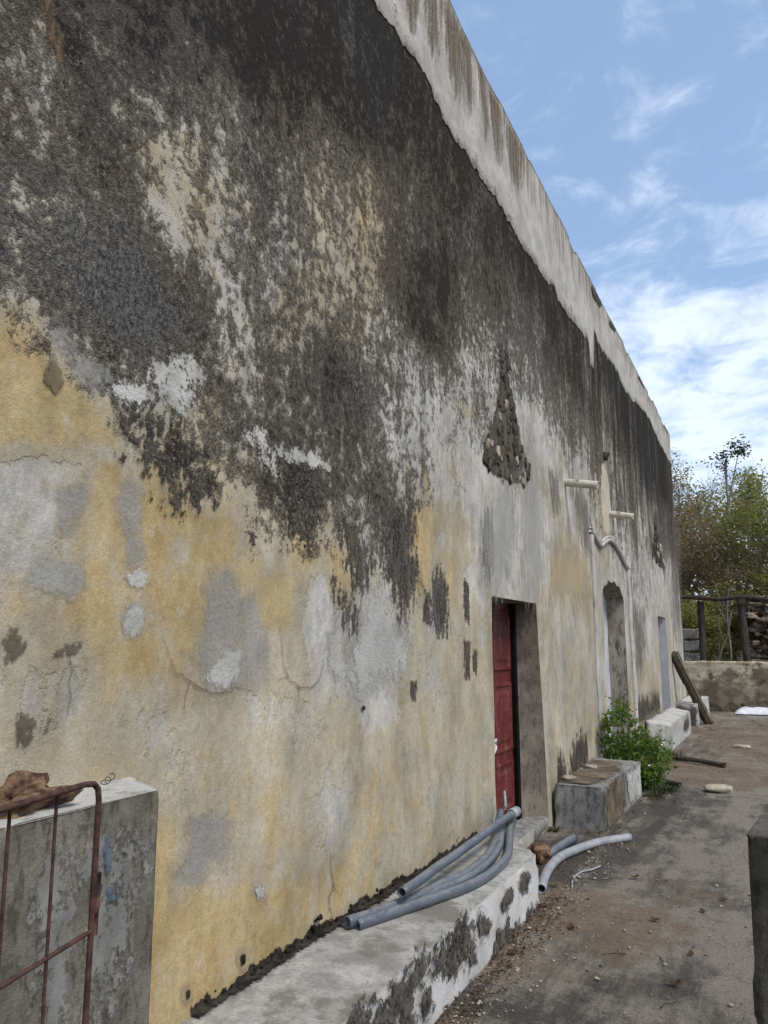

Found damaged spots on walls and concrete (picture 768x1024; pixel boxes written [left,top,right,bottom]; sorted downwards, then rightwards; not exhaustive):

water stain [43,353,65,394]
water stain [108,388,229,523]
water stain [244,444,451,641]
water stain [481,510,497,585]
spalling [483,346,532,489]
water stain [549,470,561,511]
water stain [575,462,613,557]
water stain [661,501,683,641]
crack [162,636,255,714]
crack [280,625,325,698]
water stain [463,577,479,680]